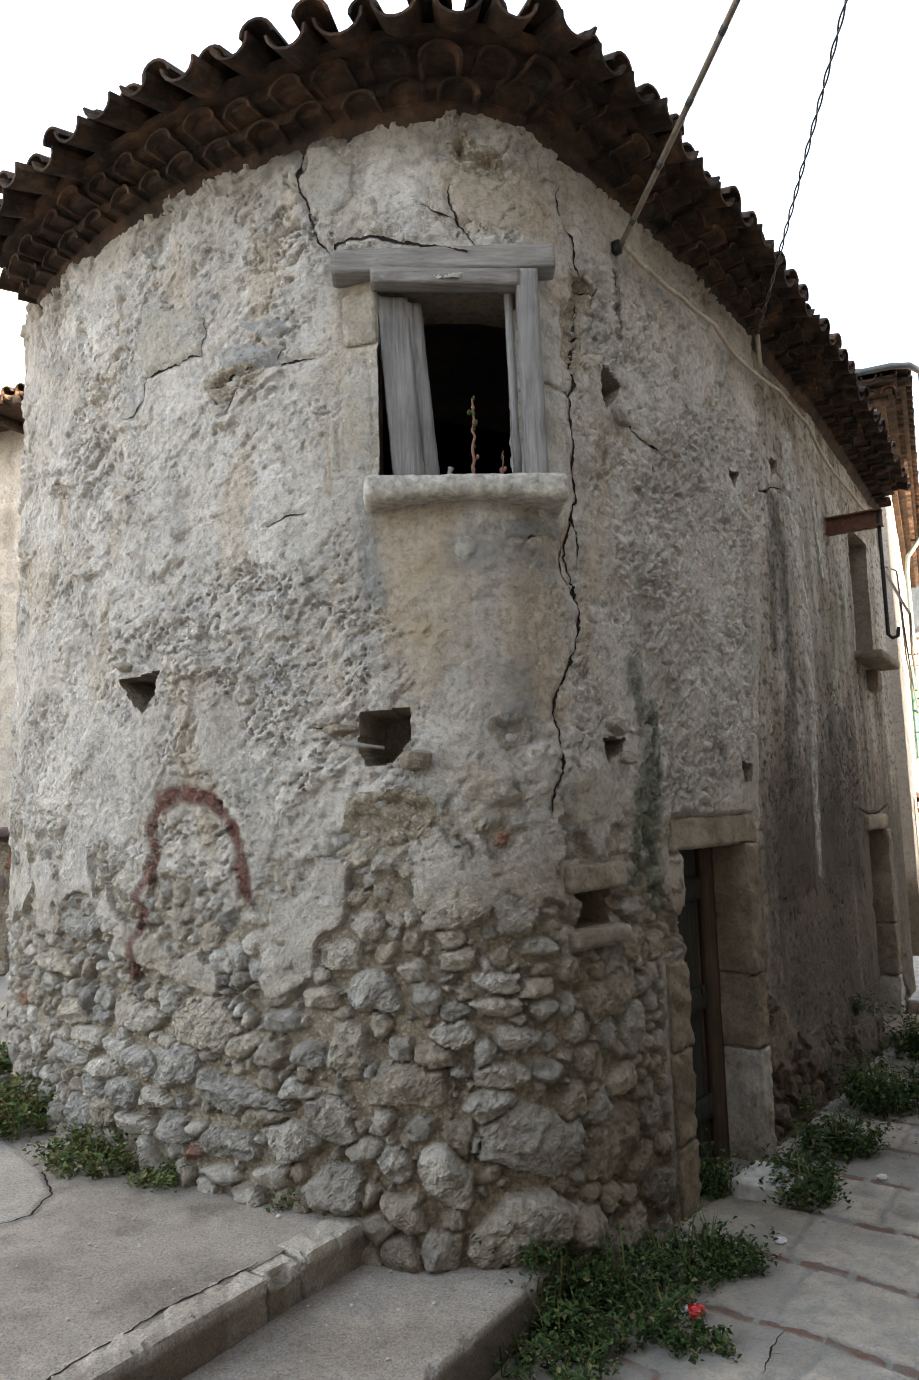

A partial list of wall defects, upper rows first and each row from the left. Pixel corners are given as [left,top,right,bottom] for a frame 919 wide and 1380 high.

crack [295,154,475,255]
crack [521,187,597,815]
flaking render [487,711,534,751]
flaking render [3,781,687,1289]
flaking render [767,977,916,1146]